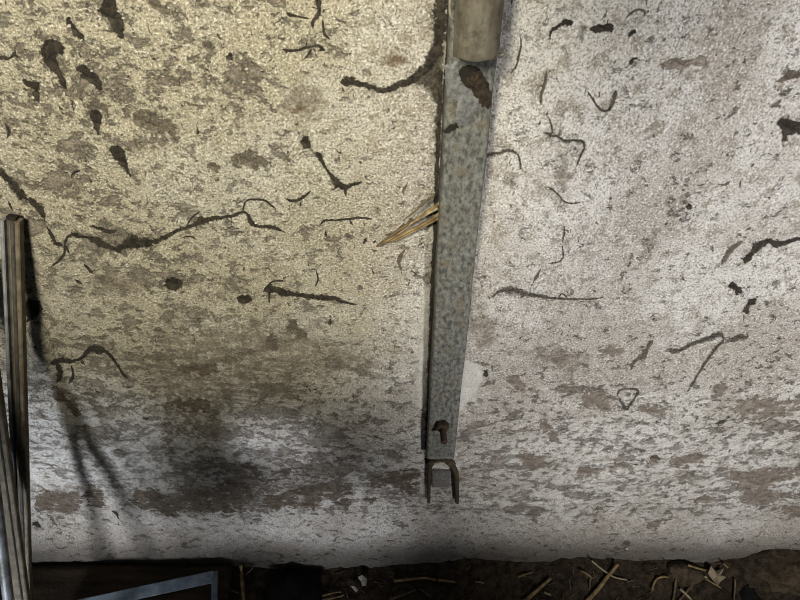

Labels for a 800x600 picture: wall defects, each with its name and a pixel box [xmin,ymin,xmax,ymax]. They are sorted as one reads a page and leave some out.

crack [313,152,362,196]
crack [0,168,311,284]
crack [262,271,357,305]
crack [340,0,448,464]
crack [491,227,604,301]
crack [721,237,800,265]
crack [50,344,128,384]
leakage [153,324,372,399]
crack [617,331,749,410]